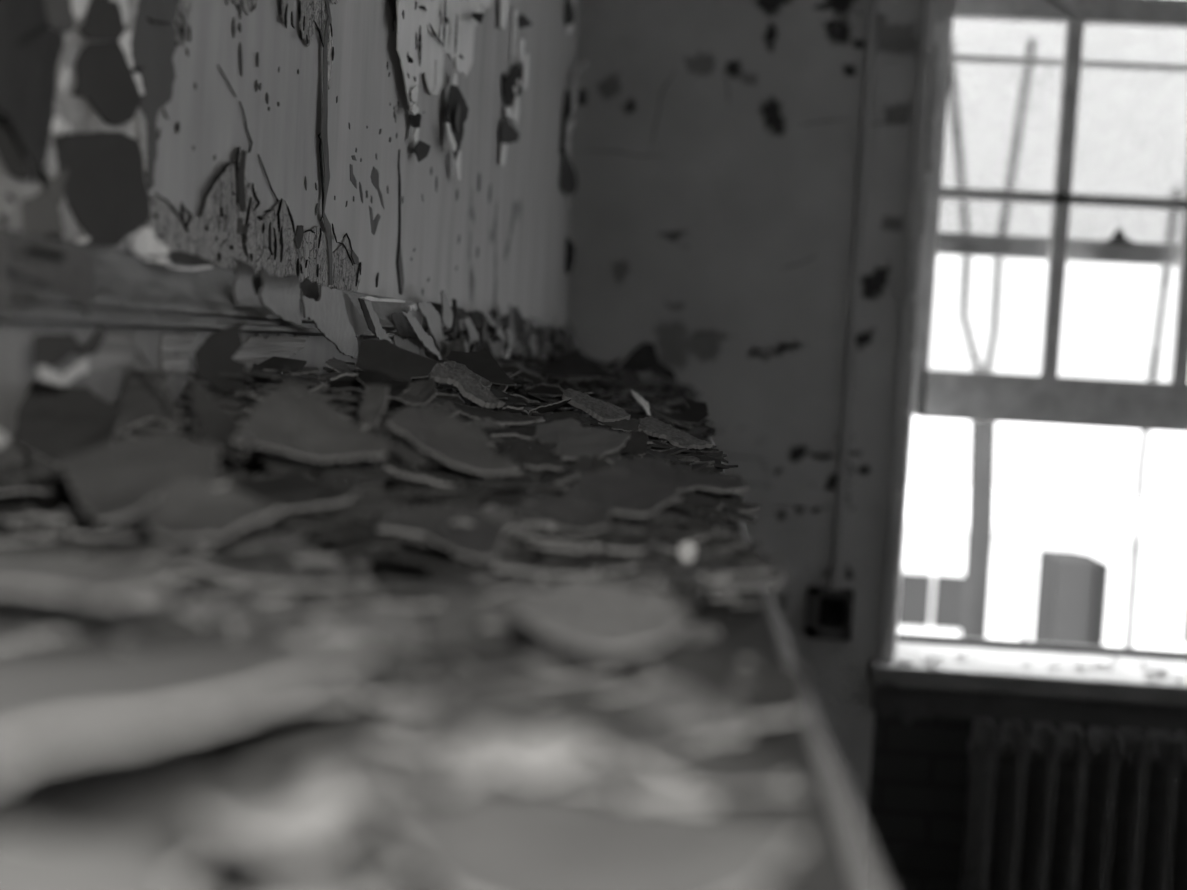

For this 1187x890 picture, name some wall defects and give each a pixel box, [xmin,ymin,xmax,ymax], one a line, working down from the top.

peeling [225,0,280,111]
peeling [366,0,533,201]
peeling [565,0,576,35]
peeling [560,59,588,195]
peeling [334,148,389,235]
peeling [565,237,575,275]
peeling [0,260,808,890]